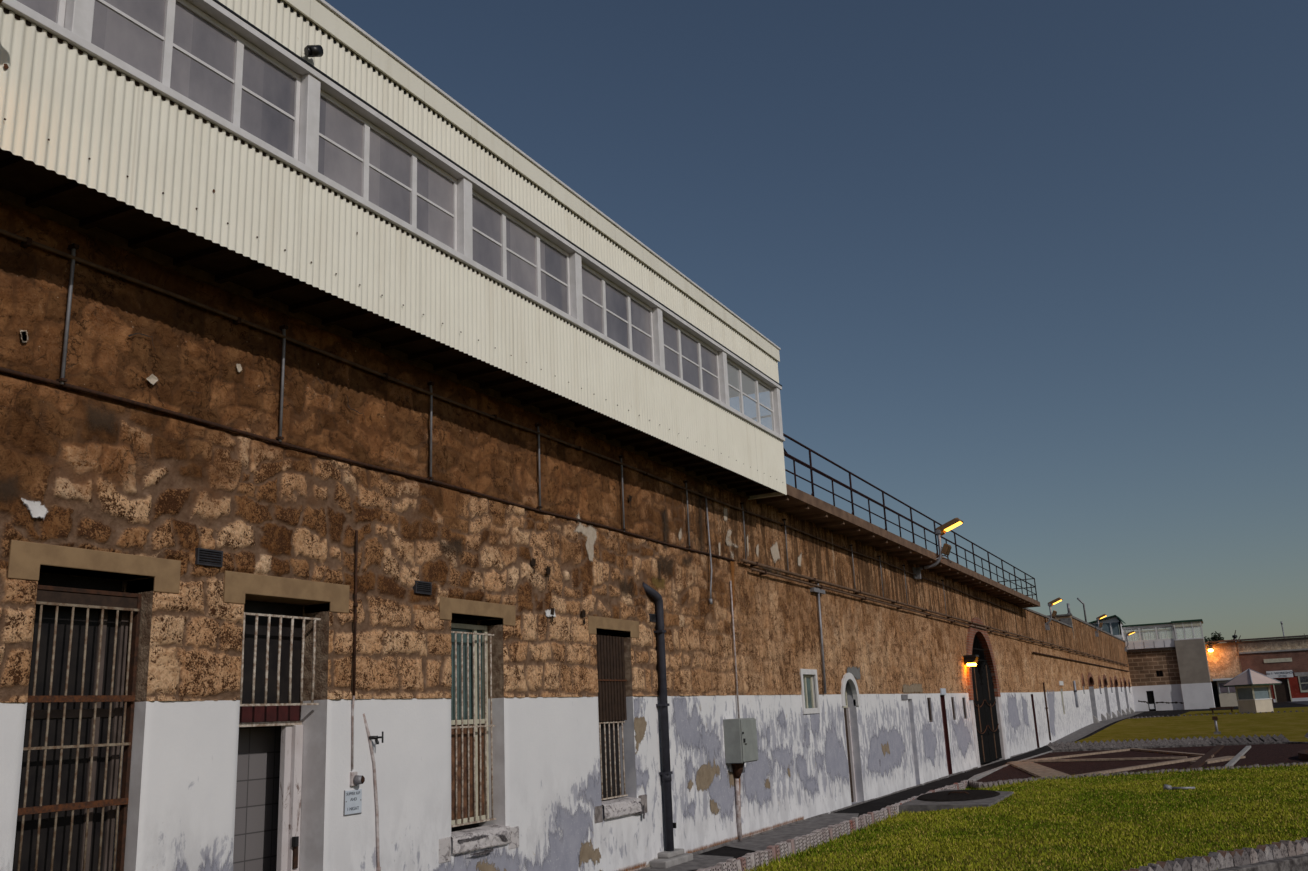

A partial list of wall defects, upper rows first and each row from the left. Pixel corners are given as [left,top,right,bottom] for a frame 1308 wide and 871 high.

peeling [672,698,849,822]
peeling [867,726,905,777]
peeling [922,722,937,767]
peeling [952,717,972,758]
peeling [434,773,603,871]
peeling [176,851,233,871]